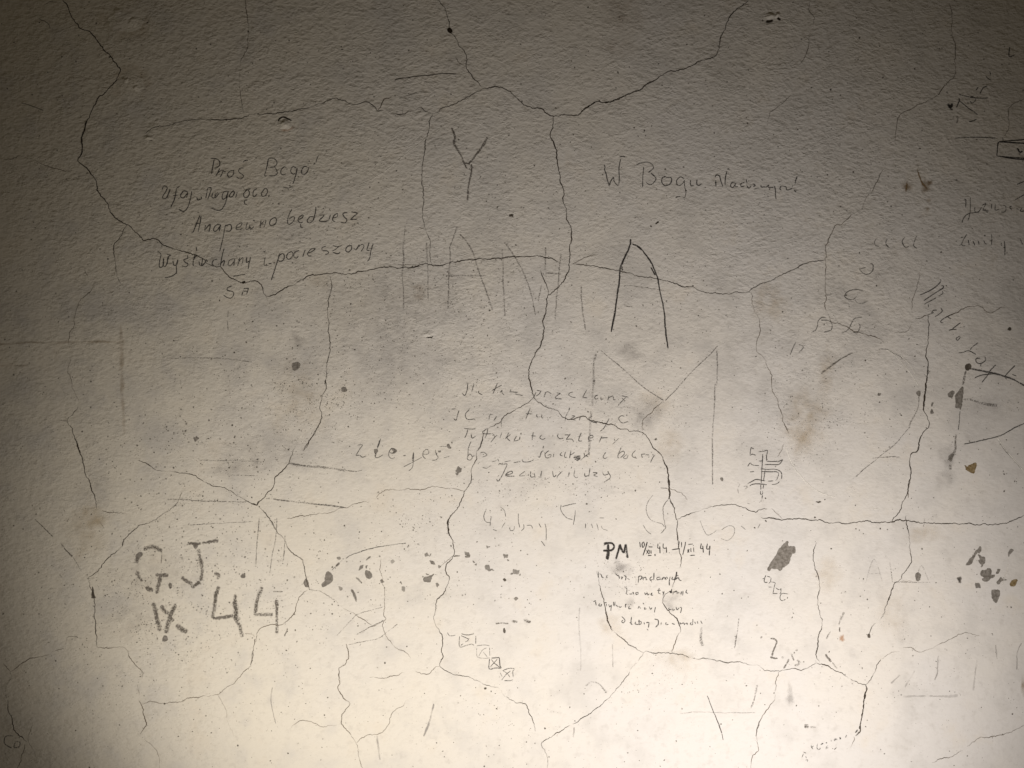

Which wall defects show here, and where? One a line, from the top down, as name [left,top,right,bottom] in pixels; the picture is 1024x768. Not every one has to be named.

crack [40,1,879,685]
crack [713,289,1021,634]
spalling [767,541,796,571]
spalling [942,516,1018,608]
crack [298,648,400,764]
crack [512,675,628,744]
crack [751,545,887,761]